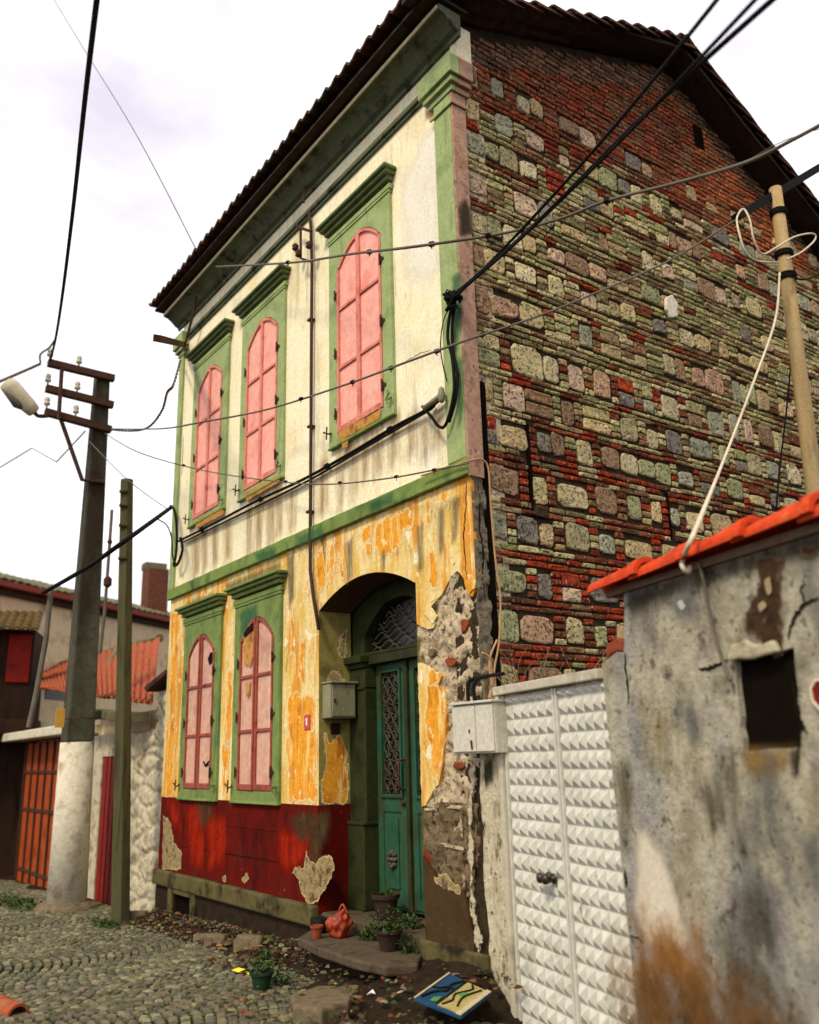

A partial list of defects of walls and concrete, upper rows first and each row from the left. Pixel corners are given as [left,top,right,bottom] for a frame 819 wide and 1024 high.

peeling [356,487,453,559]
water stain [439,500,458,549]
water stain [227,549,293,605]
peeling [304,540,344,596]
flaking render [744,555,784,658]
crack [787,581,818,639]
peeling [162,611,226,871]
peeling [285,606,350,805]
flaking render [417,546,483,952]
flaking render [280,832,334,904]